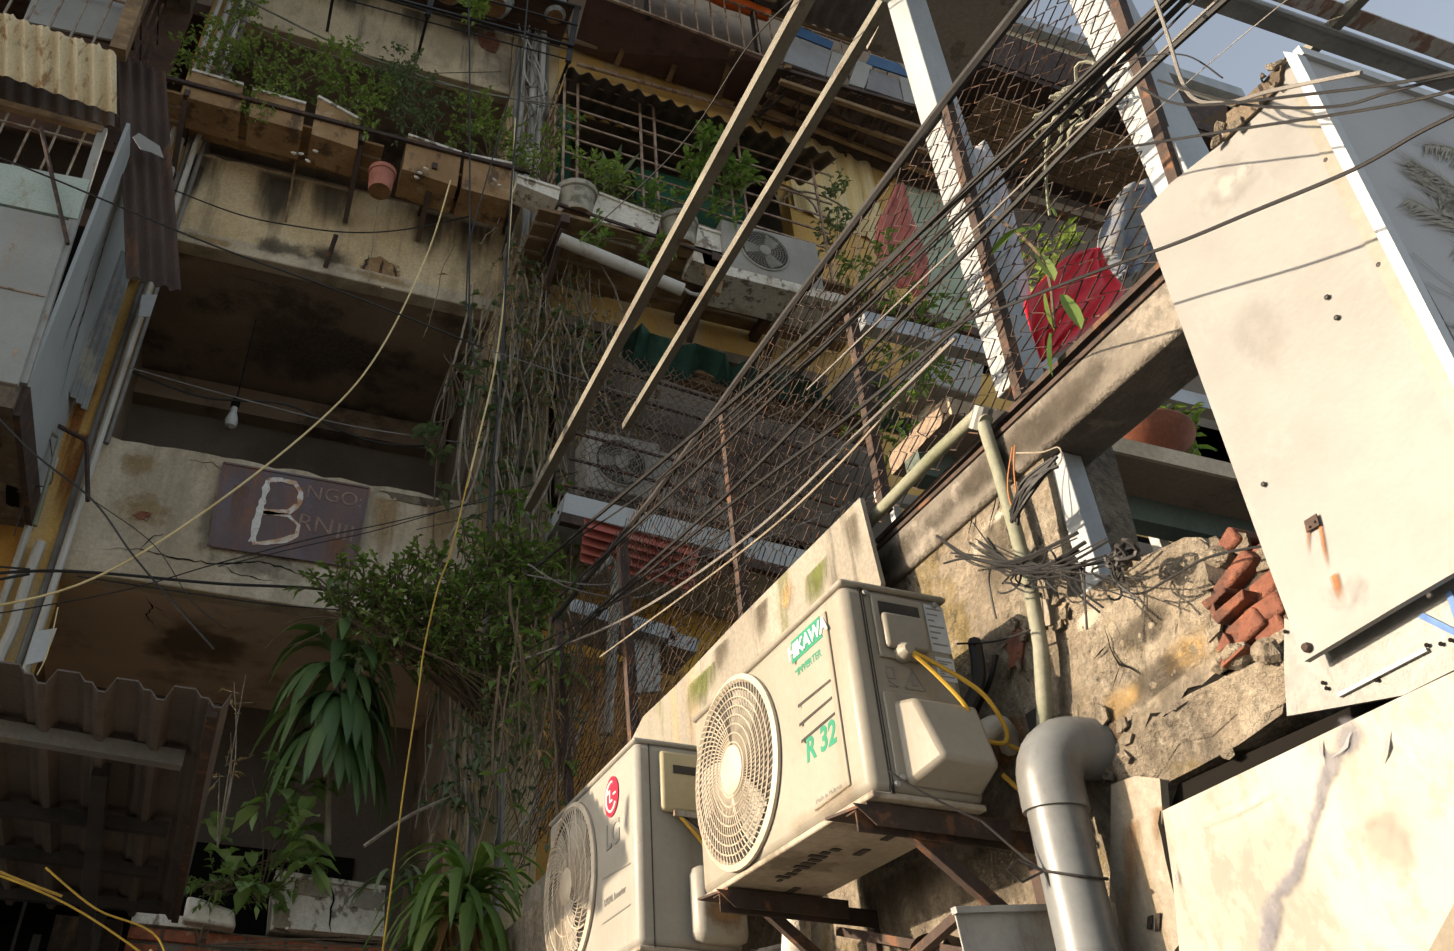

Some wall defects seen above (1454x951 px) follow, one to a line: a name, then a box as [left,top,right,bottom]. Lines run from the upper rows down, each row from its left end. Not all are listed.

leakage [189,155,211,194]
leakage [259,172,296,215]
leakage [259,238,340,261]
leakage [418,213,443,247]
corrosion [1304,513,1326,557]
spalling [1194,527,1288,675]
corrosion [1331,574,1340,593]
leakage [154,625,240,662]
crack [1094,628,1142,686]
crack [1145,661,1255,728]
corrosion [708,902,742,927]